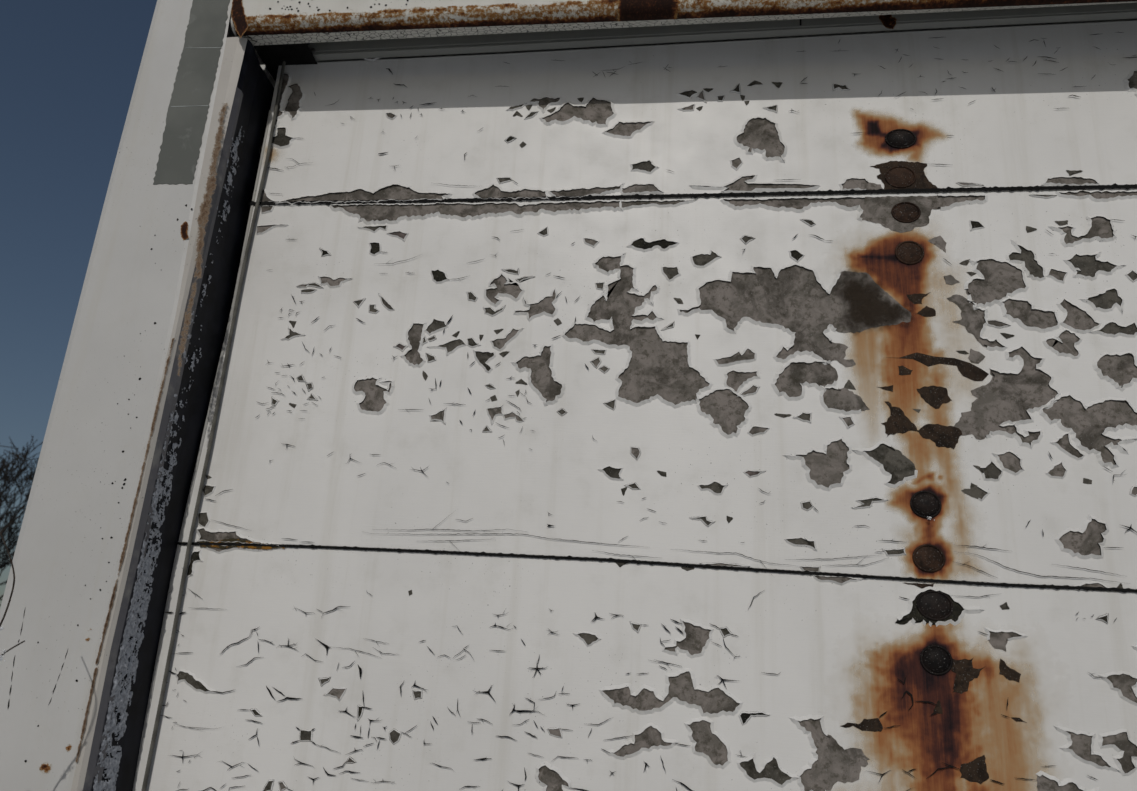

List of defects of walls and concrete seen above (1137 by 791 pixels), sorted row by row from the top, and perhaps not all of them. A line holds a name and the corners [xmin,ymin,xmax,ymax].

rust [231,0,1137,38]
peeling [256,73,988,256]
rust [853,110,946,162]
peeling [351,375,395,415]
peeling [393,170,1137,511]
rust [845,229,975,580]
crack [161,568,634,791]
crack [644,743,693,791]
peeling [599,619,883,791]
peeling [895,583,985,627]
rust [852,623,1042,791]
peeling [1054,513,1109,559]